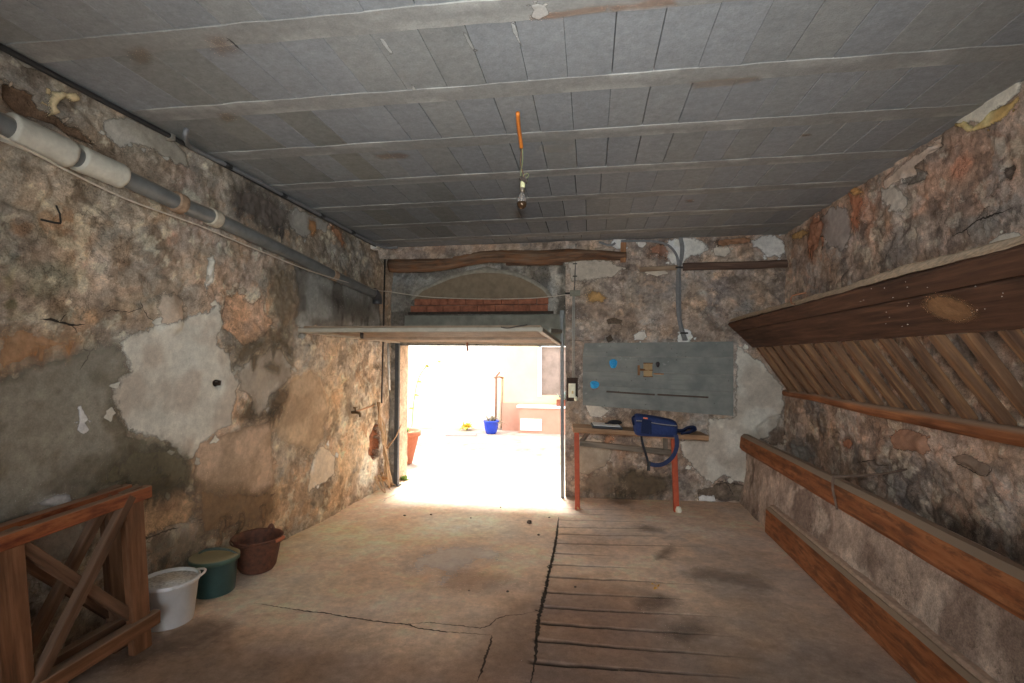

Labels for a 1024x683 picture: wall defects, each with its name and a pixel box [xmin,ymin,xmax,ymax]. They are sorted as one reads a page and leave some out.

spalling [527,0,549,20]
spalling [0,78,105,147]
crack [953,206,1011,236]
crack [42,314,94,371]
damp [76,406,91,434]
spalling [761,413,787,447]
damp [37,495,70,512]
damp [95,446,276,539]
damp [36,523,84,564]
crack [257,517,559,683]